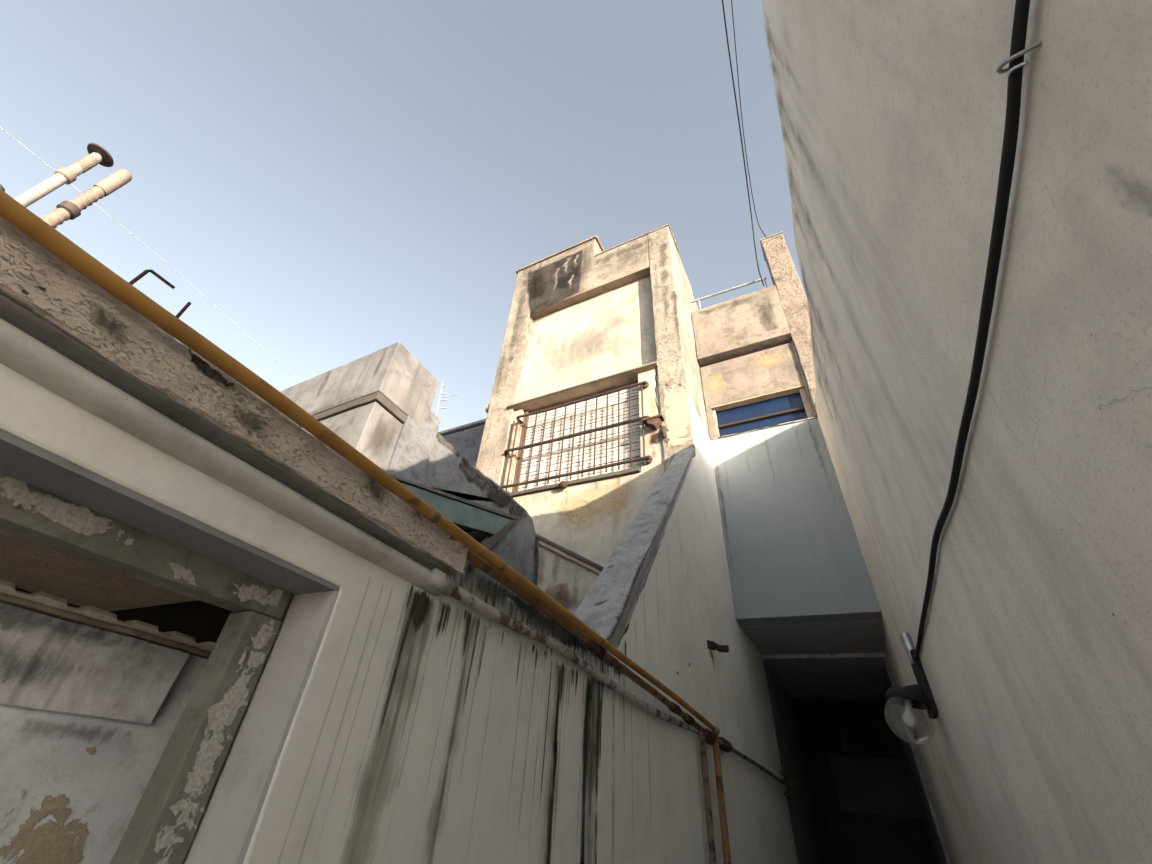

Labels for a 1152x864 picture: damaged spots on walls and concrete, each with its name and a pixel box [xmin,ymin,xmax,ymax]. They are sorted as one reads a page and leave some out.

damp [514,250,582,337]
spalling [189,348,241,390]
flaking render [663,379,692,446]
peeling [0,476,134,545]
peeling [167,561,197,586]
damp [533,537,569,606]
peeling [154,582,283,864]
damp [380,585,487,799]
damp [454,562,626,864]
peeling [0,788,93,864]